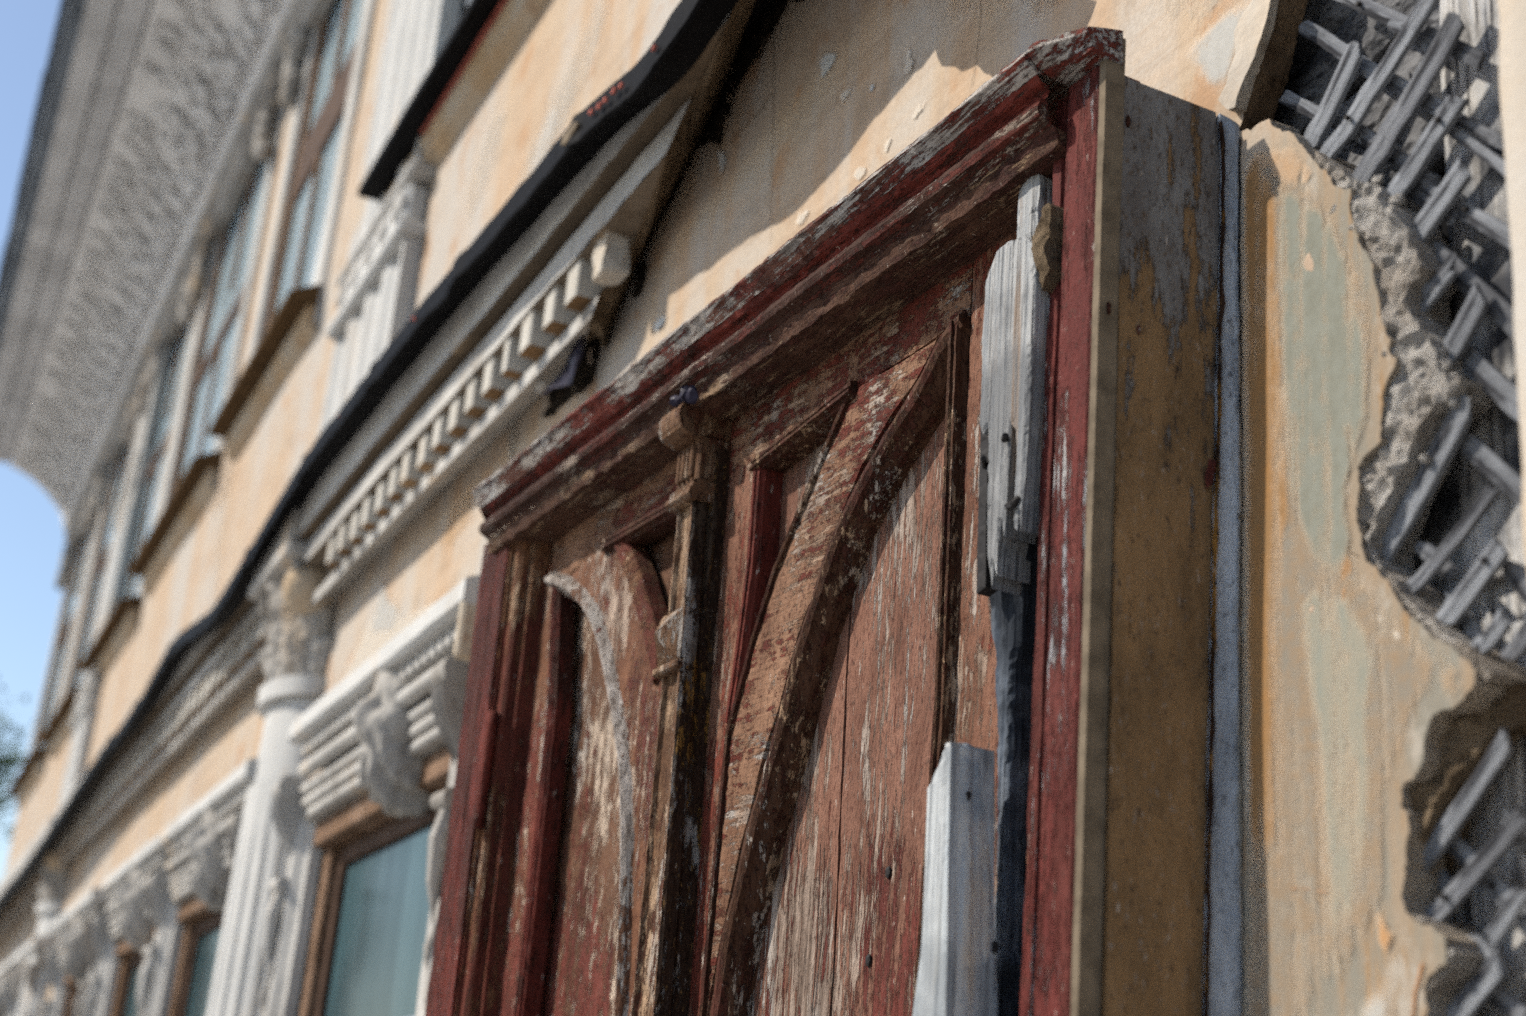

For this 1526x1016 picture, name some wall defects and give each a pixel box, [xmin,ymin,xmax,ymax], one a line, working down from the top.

flaking render [1273,0,1526,1016]